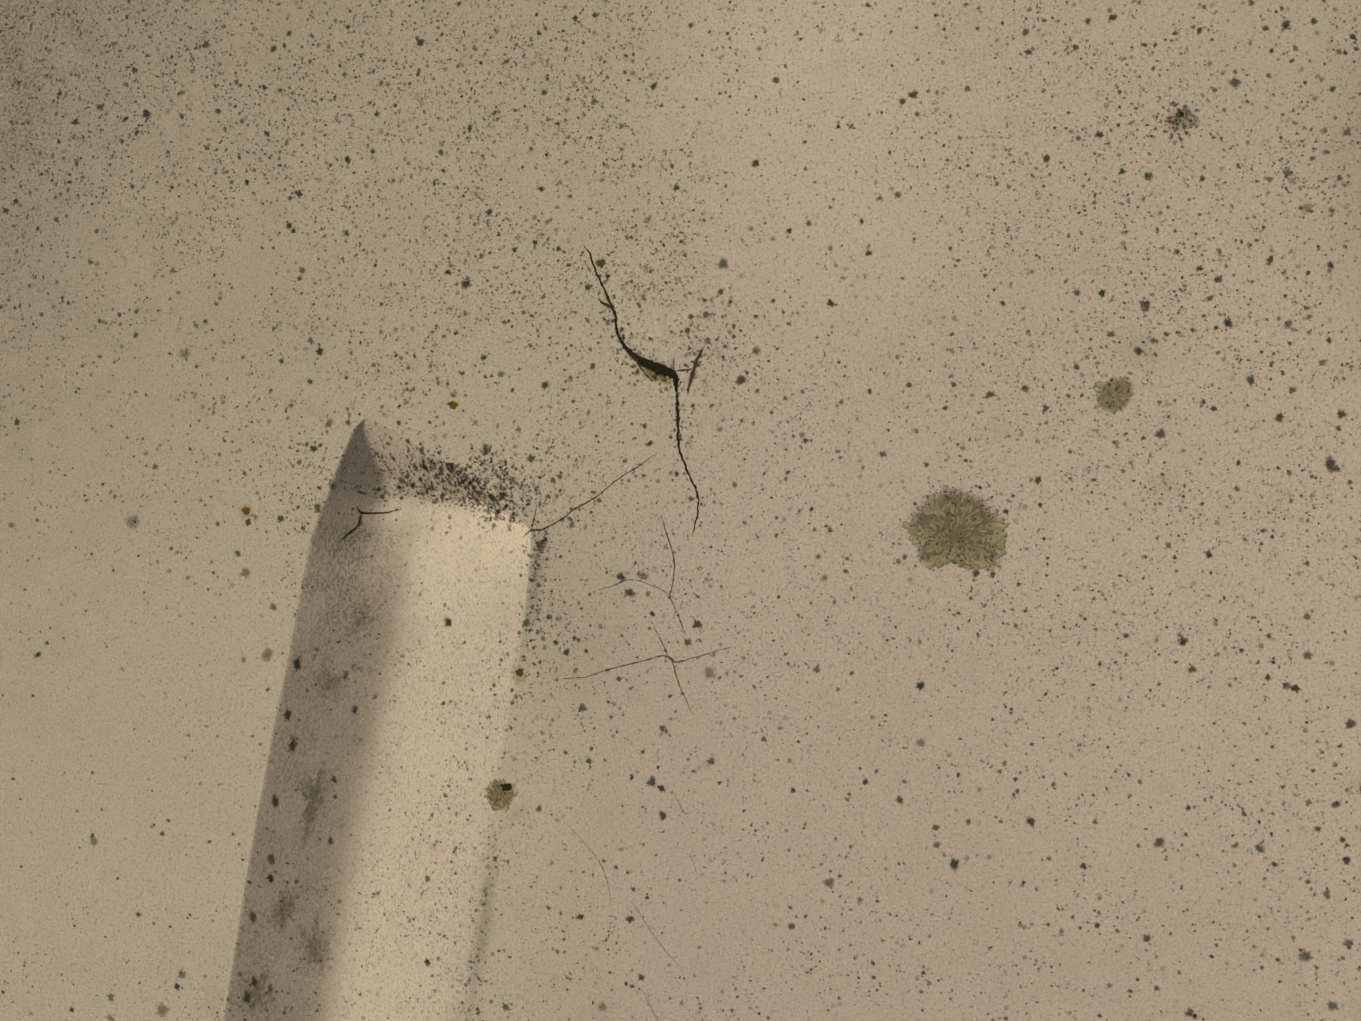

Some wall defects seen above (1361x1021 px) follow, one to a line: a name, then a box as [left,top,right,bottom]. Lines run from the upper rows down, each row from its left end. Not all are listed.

crack [340,508,400,541]
crack [525,246,729,711]